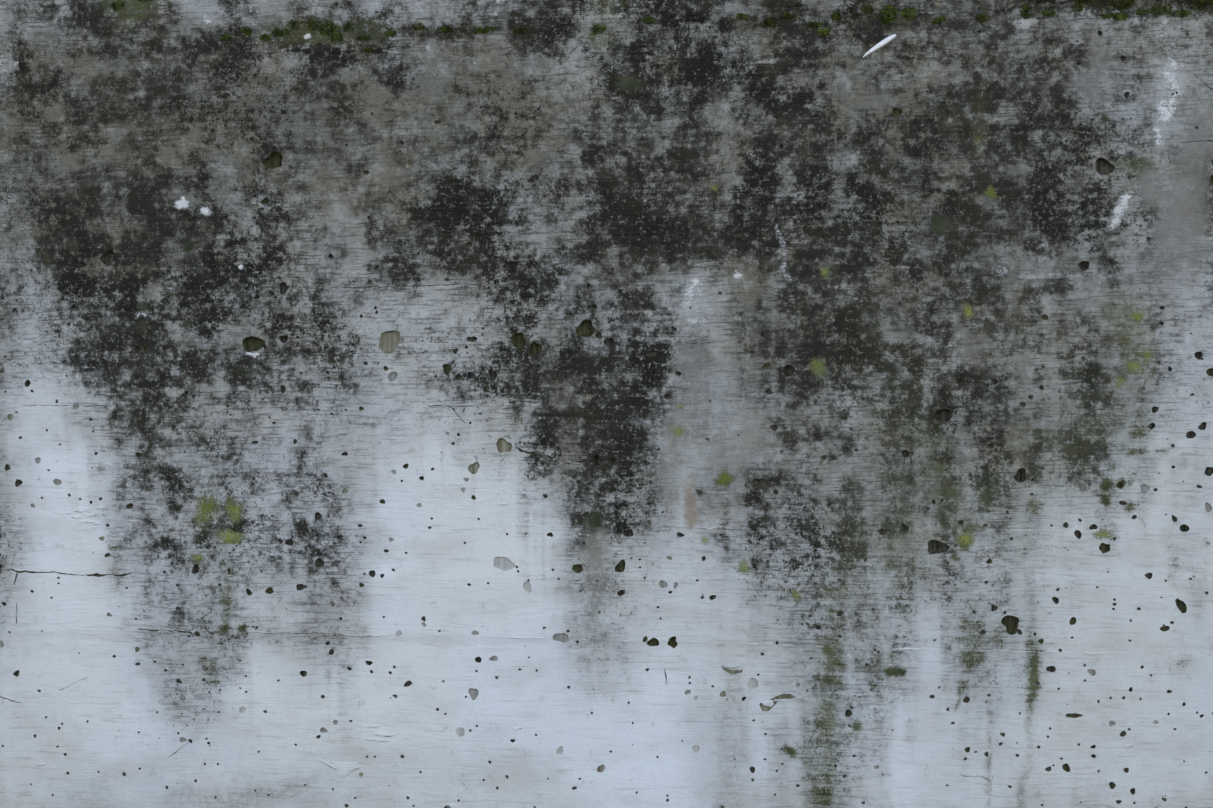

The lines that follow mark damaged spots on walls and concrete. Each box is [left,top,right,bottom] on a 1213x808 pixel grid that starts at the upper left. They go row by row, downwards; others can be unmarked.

damp [0,0,1213,646]
crack [0,569,131,584]
damp [143,573,252,684]
spalling [759,694,796,711]
damp [854,640,883,691]
damp [784,719,864,801]